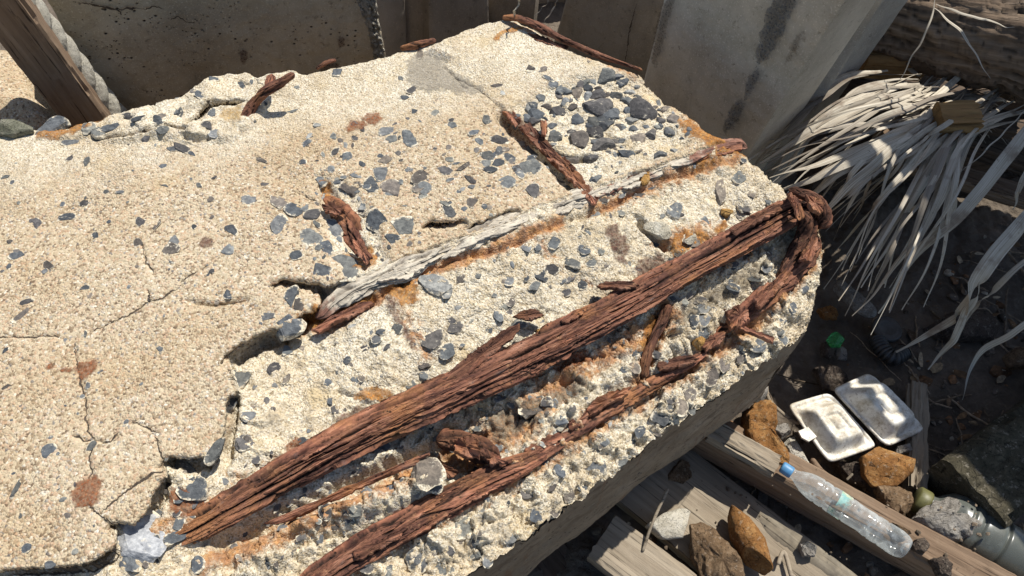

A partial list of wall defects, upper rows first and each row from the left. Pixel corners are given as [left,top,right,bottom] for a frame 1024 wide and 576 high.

rust [494,14,642,71]
rust [223,72,295,119]
rust [502,111,748,215]
spalling [0,67,824,576]
crack [0,246,206,576]
rust [169,180,833,576]
rust [71,475,101,507]